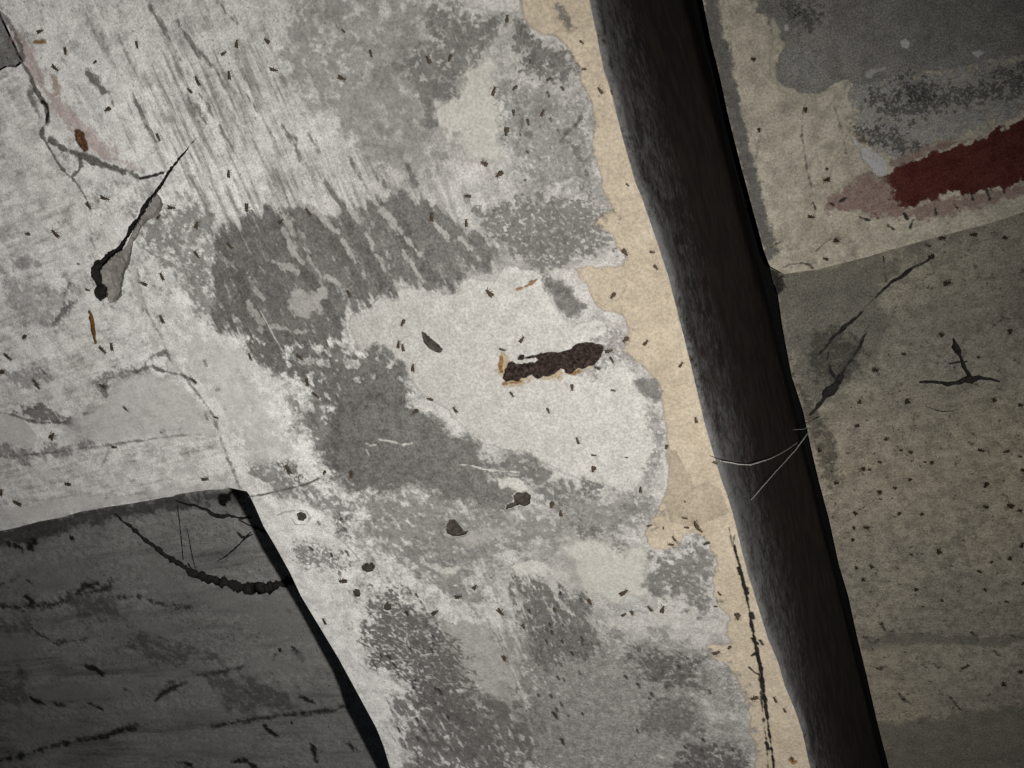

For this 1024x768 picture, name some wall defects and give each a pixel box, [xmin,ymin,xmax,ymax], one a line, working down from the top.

crack [0,11,196,303]
peeling [246,213,341,334]
peeling [299,201,366,277]
water stain [139,2,759,768]
rust [498,342,604,387]
peeling [349,0,810,768]
crack [729,527,775,768]